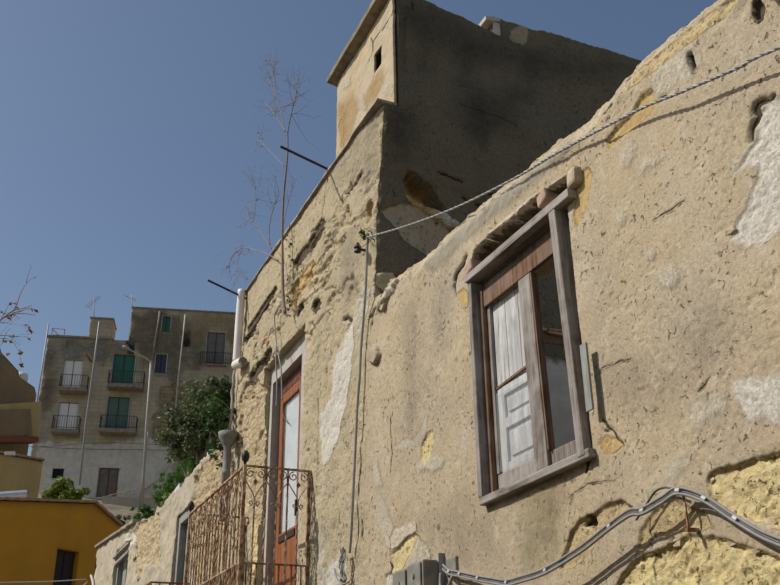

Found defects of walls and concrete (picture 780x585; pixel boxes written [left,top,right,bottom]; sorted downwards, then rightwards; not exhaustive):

spalling [628,0,739,87]
spalling [752,0,766,24]
spalling [607,89,660,149]
spalling [725,100,780,245]
peeling [368,177,459,256]
spalling [290,260,322,317]
spalling [393,416,443,473]
spalling [708,452,780,530]
spalling [560,501,631,570]
spalling [618,499,780,585]